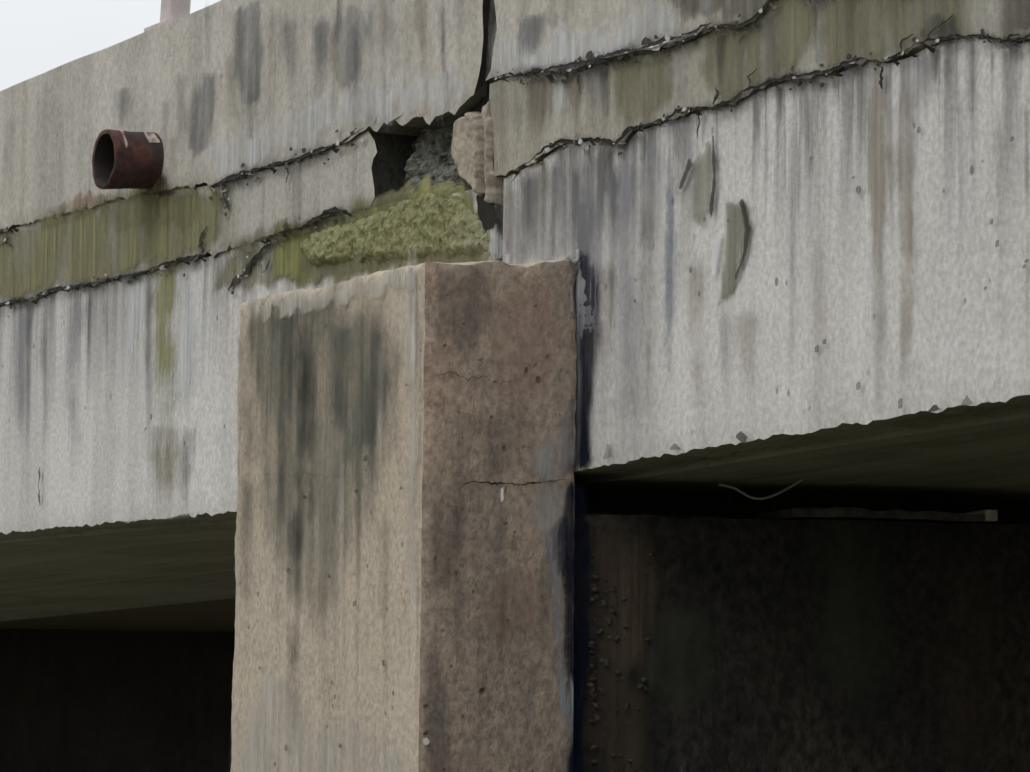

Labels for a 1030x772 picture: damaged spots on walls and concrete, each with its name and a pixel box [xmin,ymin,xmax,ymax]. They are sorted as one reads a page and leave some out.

crack [494,0,777,95]
crack [511,15,1030,182]
crack [0,128,363,317]
spalling [395,111,495,230]
damp [249,280,351,317]
damp [377,271,416,384]
crack [465,477,576,502]